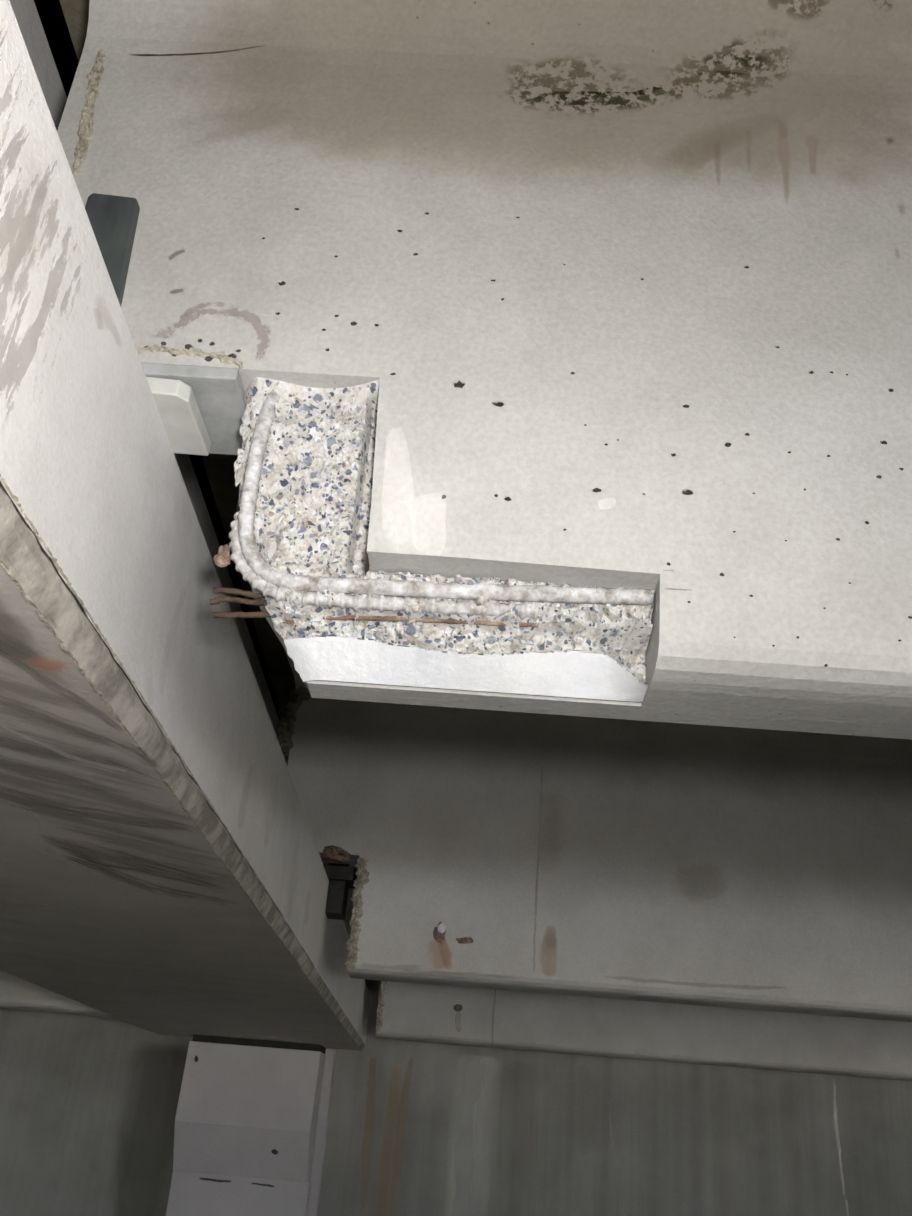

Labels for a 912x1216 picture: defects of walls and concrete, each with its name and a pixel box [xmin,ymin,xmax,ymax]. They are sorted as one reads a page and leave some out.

mould [769,0,824,17]
crack [134,46,260,56]
mould [515,44,784,109]
spalling [138,339,243,371]
spalling [209,377,656,702]